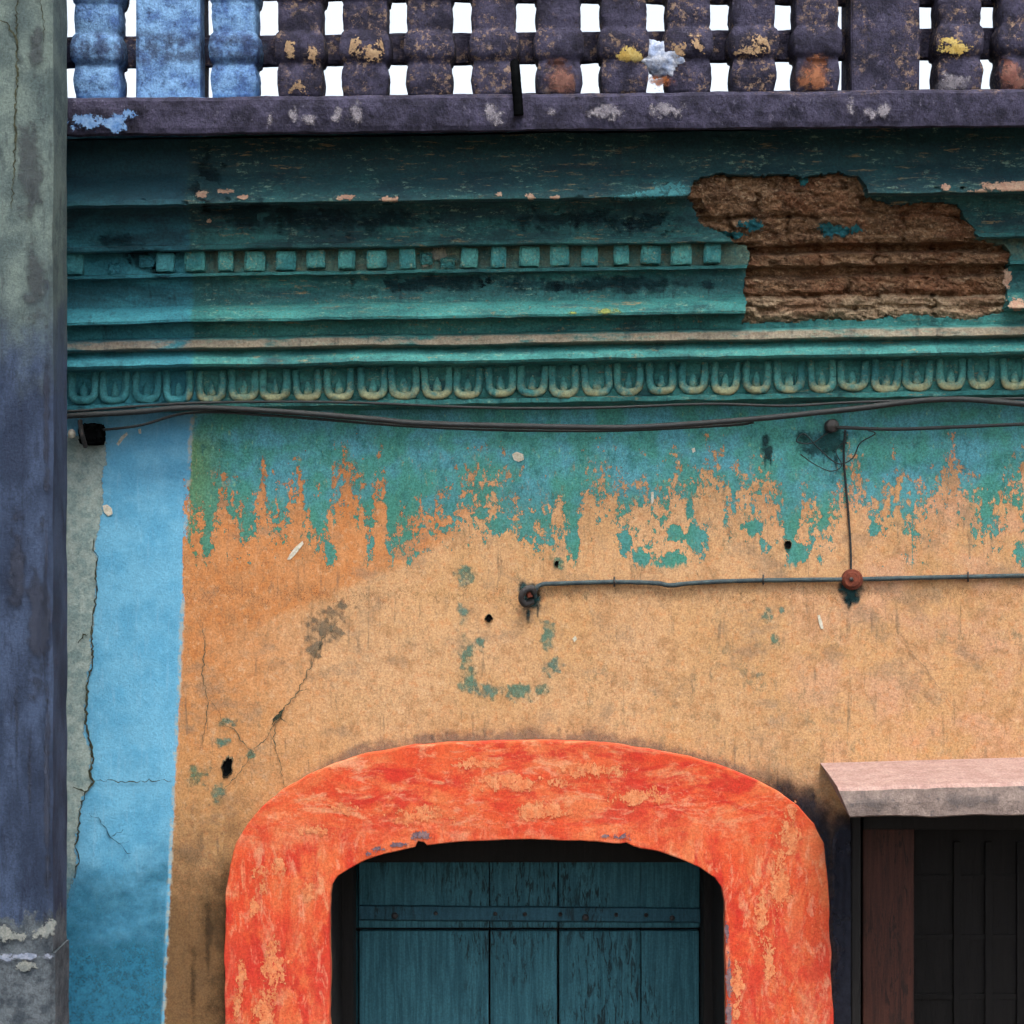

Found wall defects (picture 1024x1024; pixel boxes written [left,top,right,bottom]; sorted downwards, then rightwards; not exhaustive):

crack [0,0,45,208]
peeling [67,109,138,134]
flaking render [349,31,385,63]
flaking render [609,172,1024,324]
peeling [182,432,1024,607]
crack [73,540,170,878]
crack [200,616,338,794]
water stain [305,601,347,665]
peeling [16,960,38,972]
peeling [0,918,57,943]
water stain [769,781,851,1024]